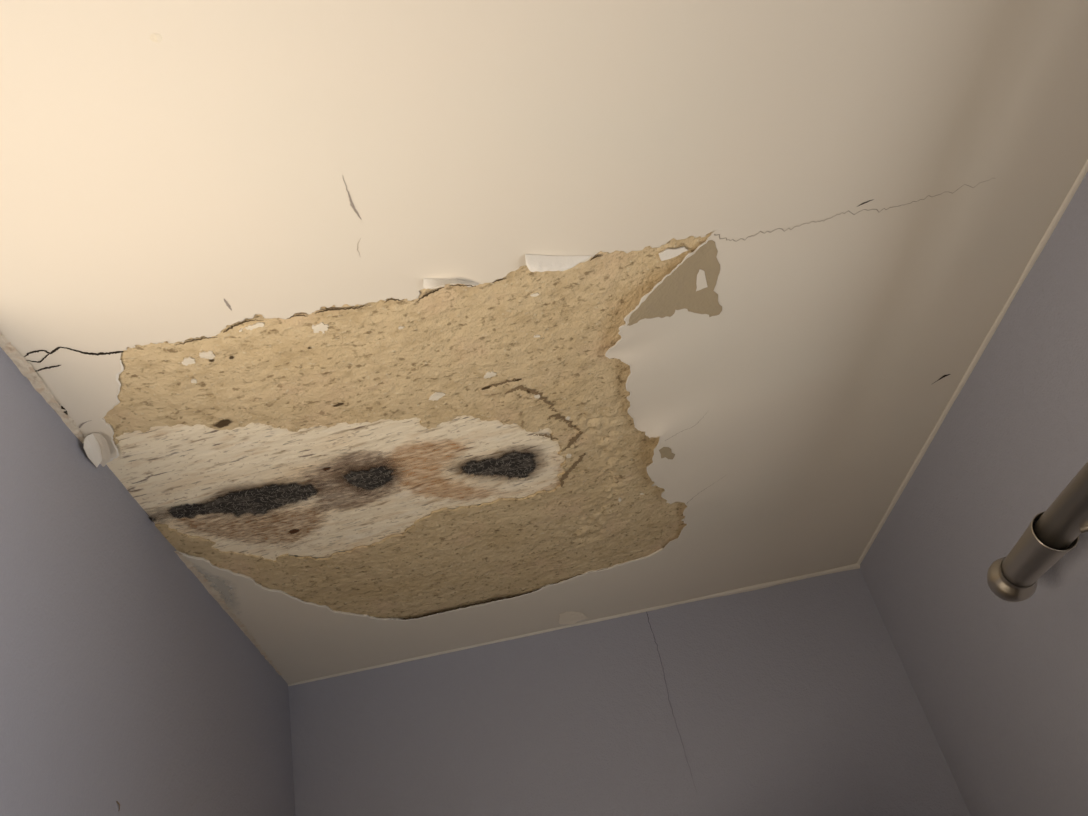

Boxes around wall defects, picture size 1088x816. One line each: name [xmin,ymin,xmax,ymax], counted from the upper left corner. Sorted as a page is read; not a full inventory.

crack [714,180,988,242]
crack [24,347,124,371]
flaking render [0,230,717,675]
leakage [458,450,538,480]
leakage [169,453,396,544]